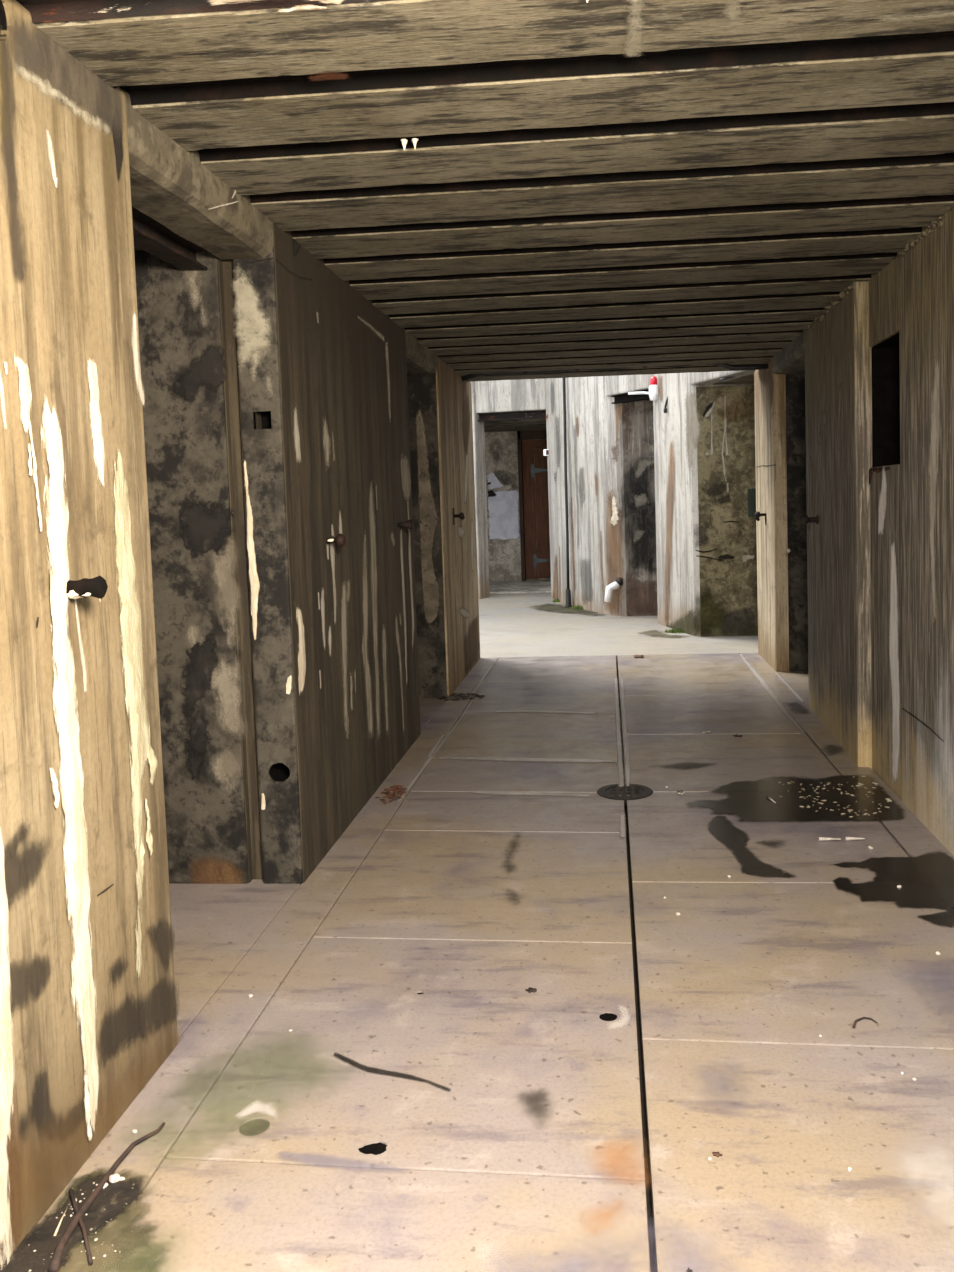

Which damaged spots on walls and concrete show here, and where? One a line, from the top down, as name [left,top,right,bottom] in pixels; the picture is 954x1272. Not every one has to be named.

damp [0,38,24,280]
damp [46,130,57,187]
damp [113,127,123,180]
damp [189,271,198,301]
damp [132,313,144,405]
damp [169,345,226,402]
damp [179,461,260,780]
damp [0,356,178,1267]
damp [918,912,954,927]